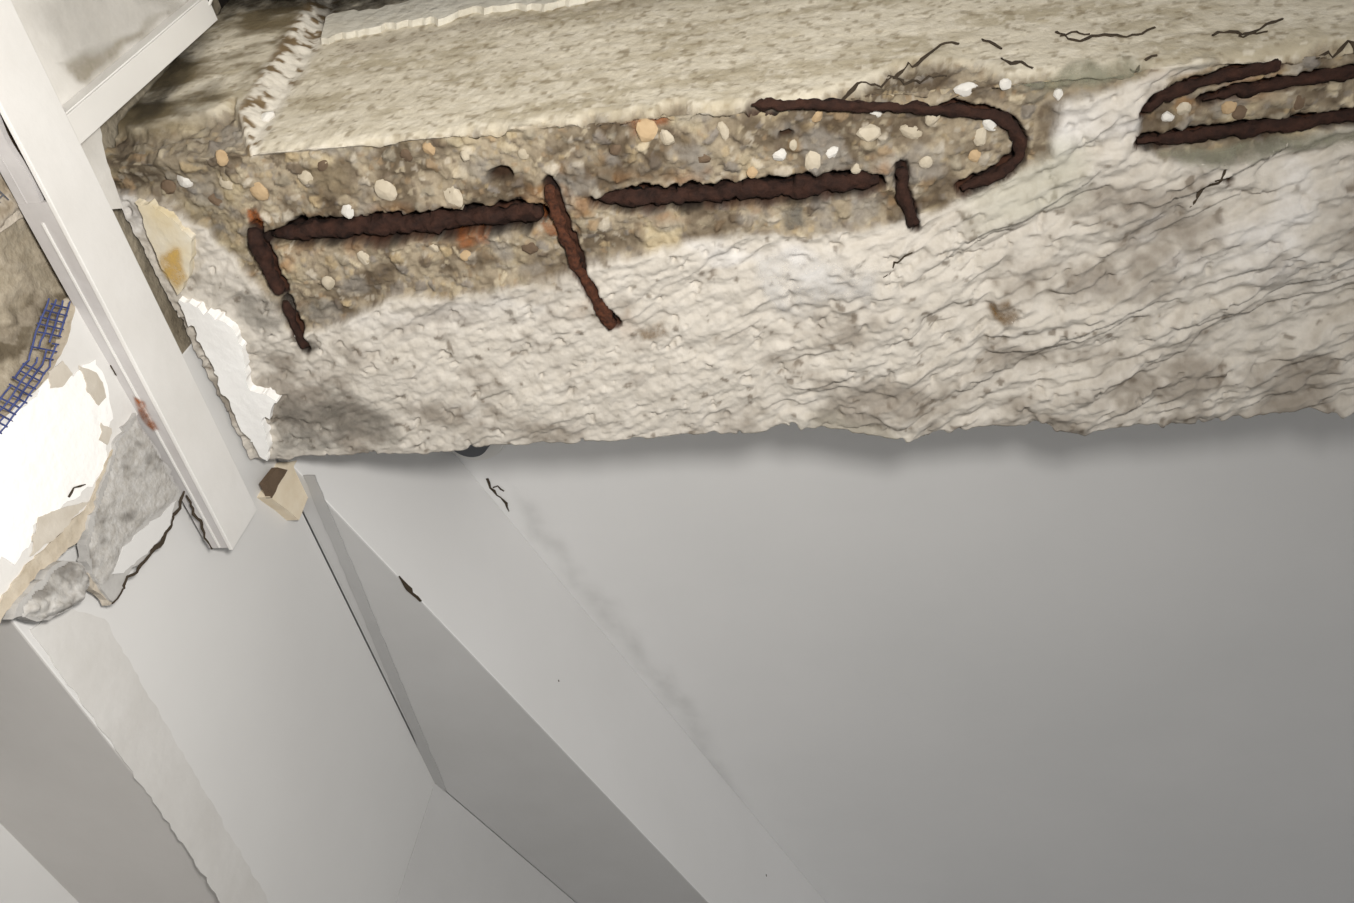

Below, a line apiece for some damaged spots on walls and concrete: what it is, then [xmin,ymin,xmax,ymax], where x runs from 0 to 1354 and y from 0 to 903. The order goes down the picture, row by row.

crack [842,38,1034,100]
crack [1055,26,1158,73]
spalling [104,45,1354,332]
peeling [0,360,181,623]
crack [112,491,213,604]